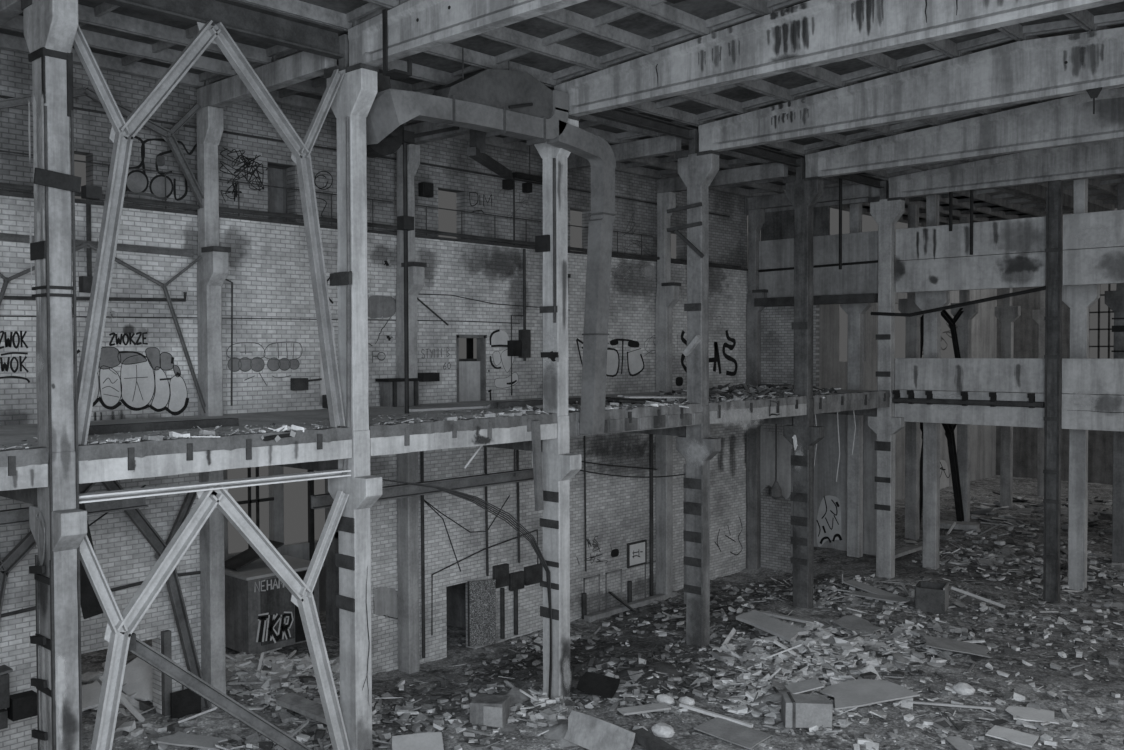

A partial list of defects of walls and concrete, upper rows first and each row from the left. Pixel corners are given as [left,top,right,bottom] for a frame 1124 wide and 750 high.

water stain [768,3,814,67]
water stain [852,0,883,34]
water stain [1064,31,1103,72]